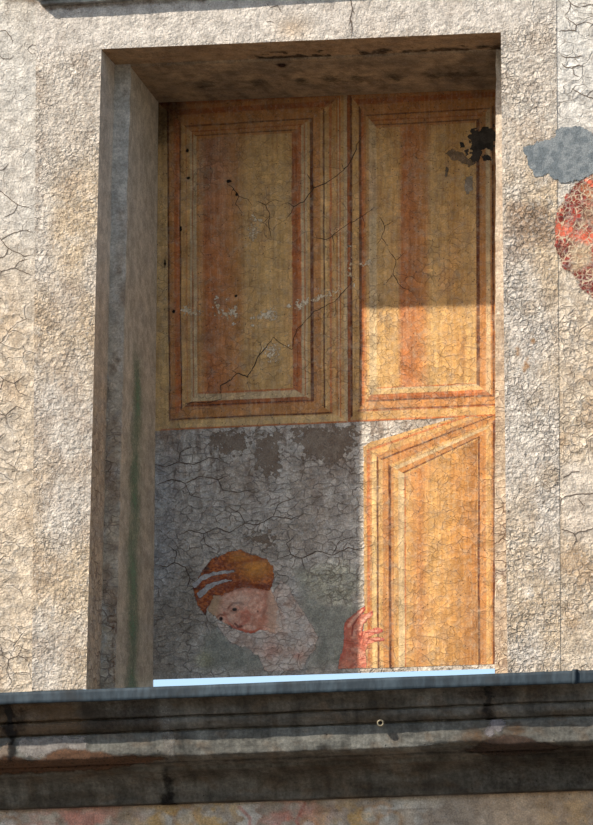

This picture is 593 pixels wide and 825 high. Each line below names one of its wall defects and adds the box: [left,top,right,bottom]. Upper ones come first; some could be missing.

crack [561,0,593,31]
crack [560,54,593,99]
crack [229,135,364,238]
peeling [445,124,496,194]
crack [0,191,34,275]
crack [314,208,410,291]
crack [183,280,355,405]
crack [0,376,27,427]
crack [155,447,361,589]
leakage [0,699,180,805]
leakage [482,686,505,737]